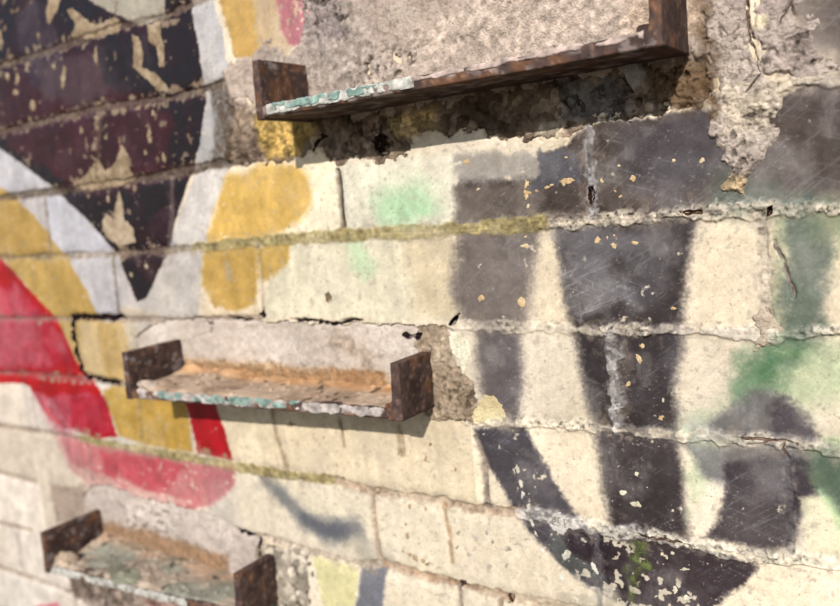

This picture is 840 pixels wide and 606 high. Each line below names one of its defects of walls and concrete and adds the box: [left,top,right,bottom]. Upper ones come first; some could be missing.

crack [777,0,795,27]
spalling [221,0,710,167]
rust [653,1,717,118]
crack [746,0,761,92]
peeling [523,178,575,208]
rust [200,363,384,385]
peeling [449,330,471,375]
peeling [505,464,538,551]
rust [103,521,227,571]